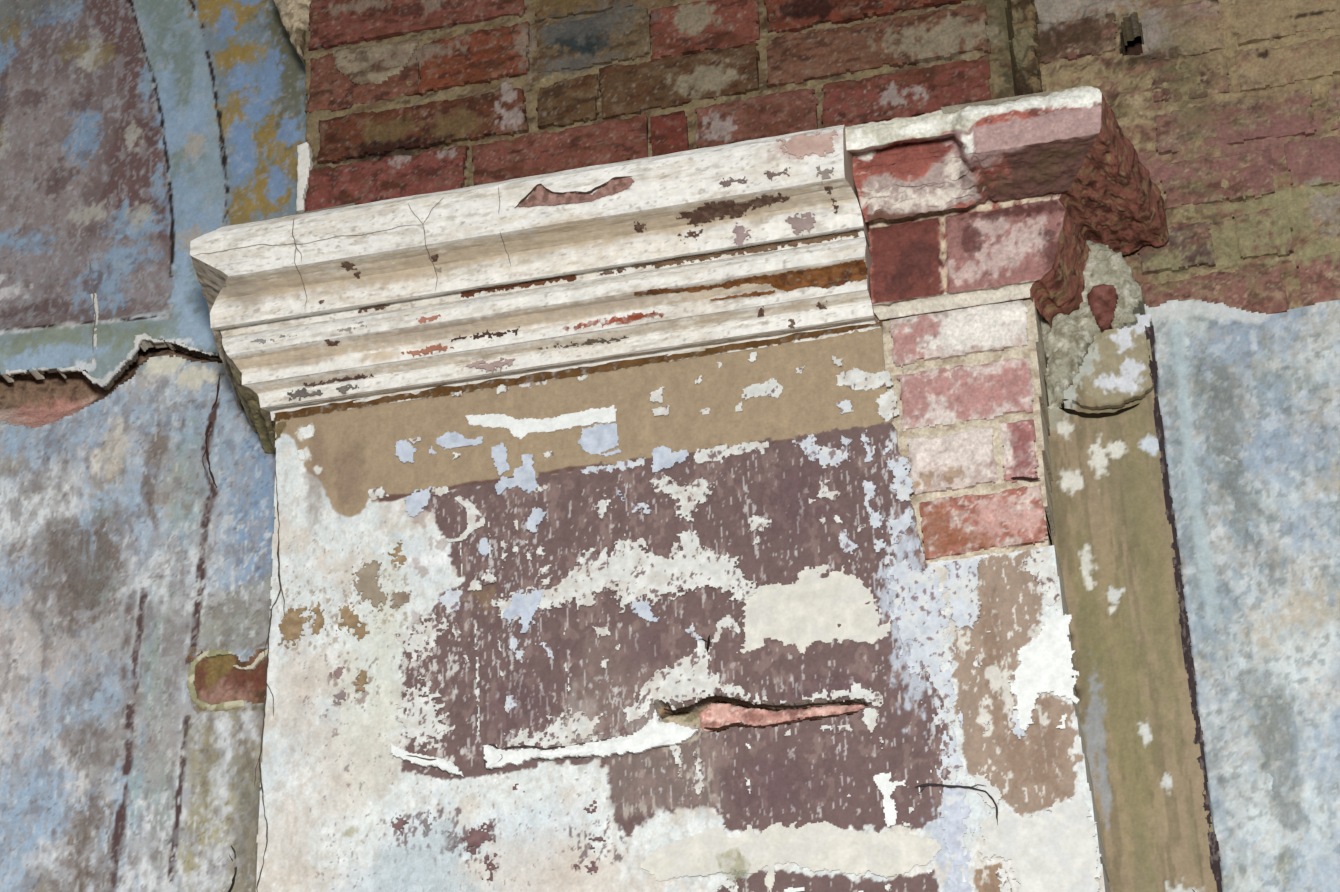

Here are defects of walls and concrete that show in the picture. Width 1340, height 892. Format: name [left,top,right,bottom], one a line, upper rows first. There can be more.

peeling [341,261,361,279]
peeling [324,304,389,346]
peeling [287,374,374,401]
peeling [298,425,314,461]
peeling [368,487,389,501]
flaking render [391,86,1169,892]
flaking render [187,540,412,712]